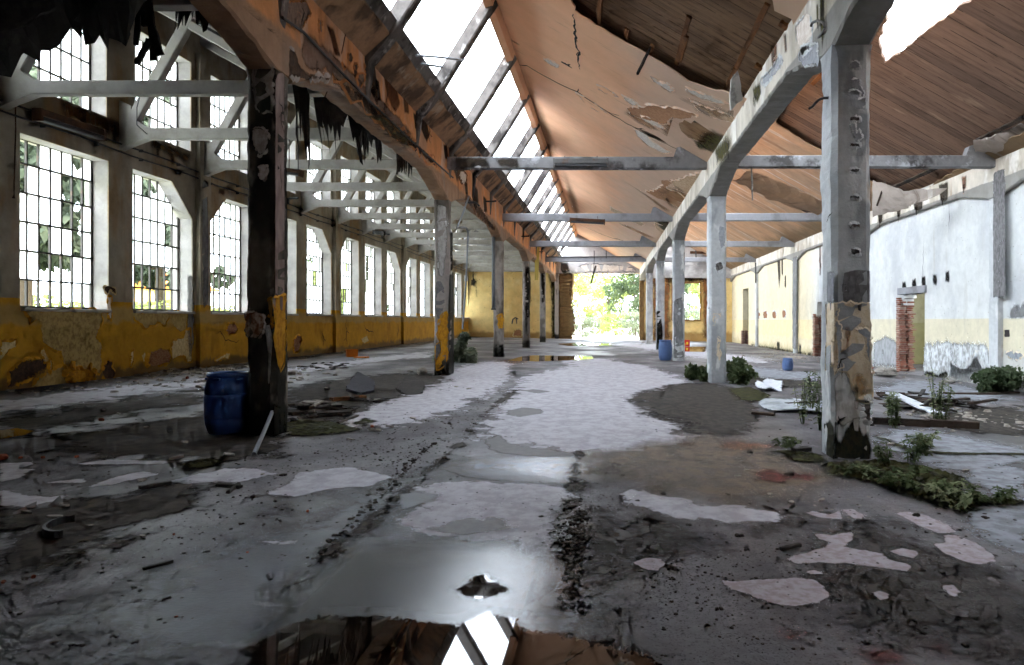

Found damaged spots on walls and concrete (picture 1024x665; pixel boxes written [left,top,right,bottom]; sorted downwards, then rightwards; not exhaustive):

peeling [251,67,275,182]
spalling [289,46,437,168]
crack [521,14,676,149]
peeling [575,75,736,154]
peeling [643,172,701,201]
peeling [0,285,117,388]
peeling [128,310,193,368]
peeling [825,300,875,426]